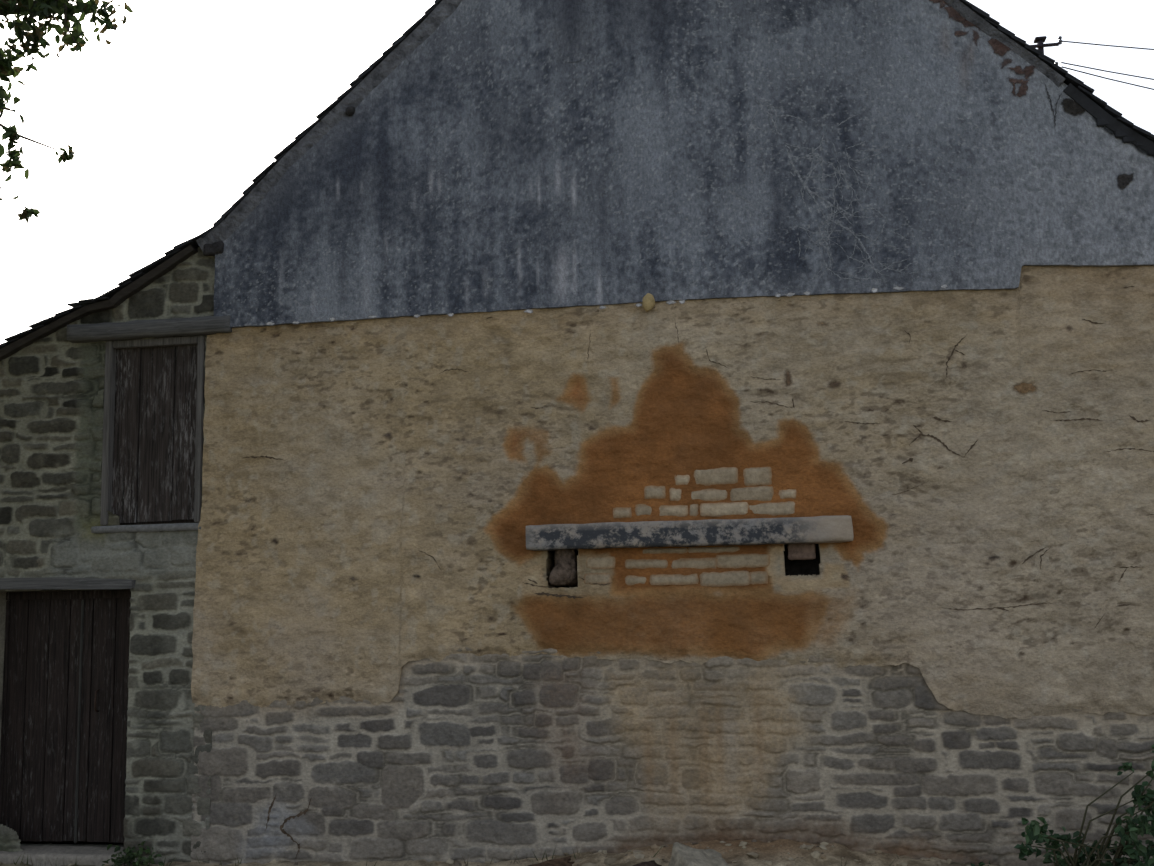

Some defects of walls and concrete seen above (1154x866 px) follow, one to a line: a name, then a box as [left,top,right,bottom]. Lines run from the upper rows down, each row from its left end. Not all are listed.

peeling [929,0,1035,97]
water stain [515,144,618,307]
water stain [760,132,799,296]
crack [945,336,966,379]
flaking render [613,467,796,518]
crack [892,416,978,495]
flaking render [583,546,770,587]
crack [1022,547,1051,569]